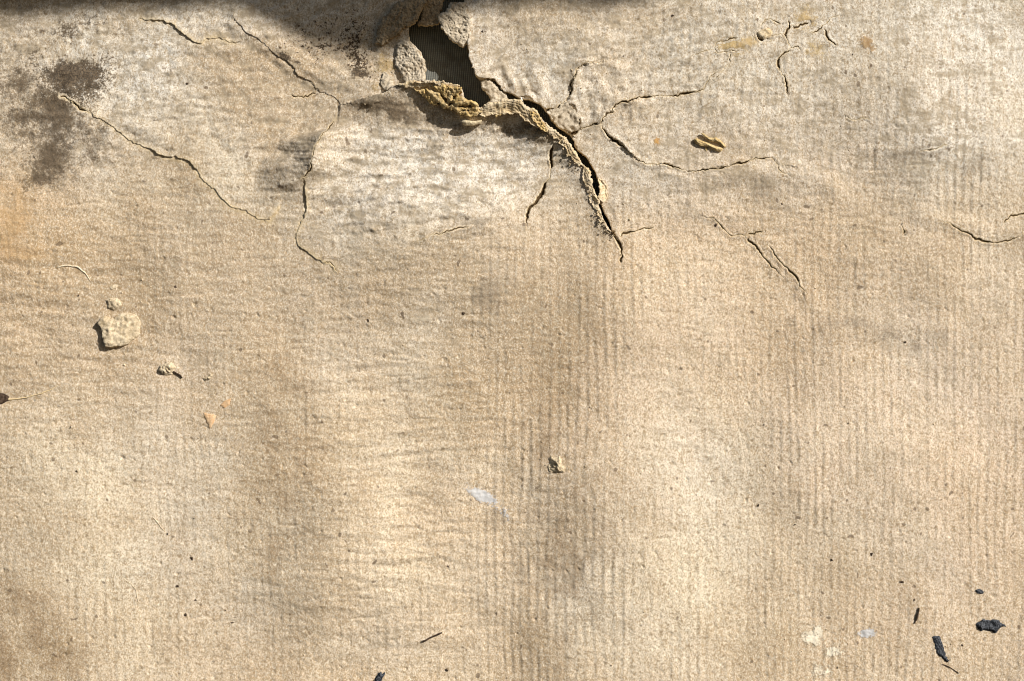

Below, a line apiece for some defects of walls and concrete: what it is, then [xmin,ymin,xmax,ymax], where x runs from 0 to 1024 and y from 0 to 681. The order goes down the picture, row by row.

damp [3,12,116,188]
crack [57,92,94,116]
peeling [60,0,549,278]
crack [287,89,340,184]
crack [375,0,844,267]
peeling [464,0,808,235]
crack [695,212,811,300]